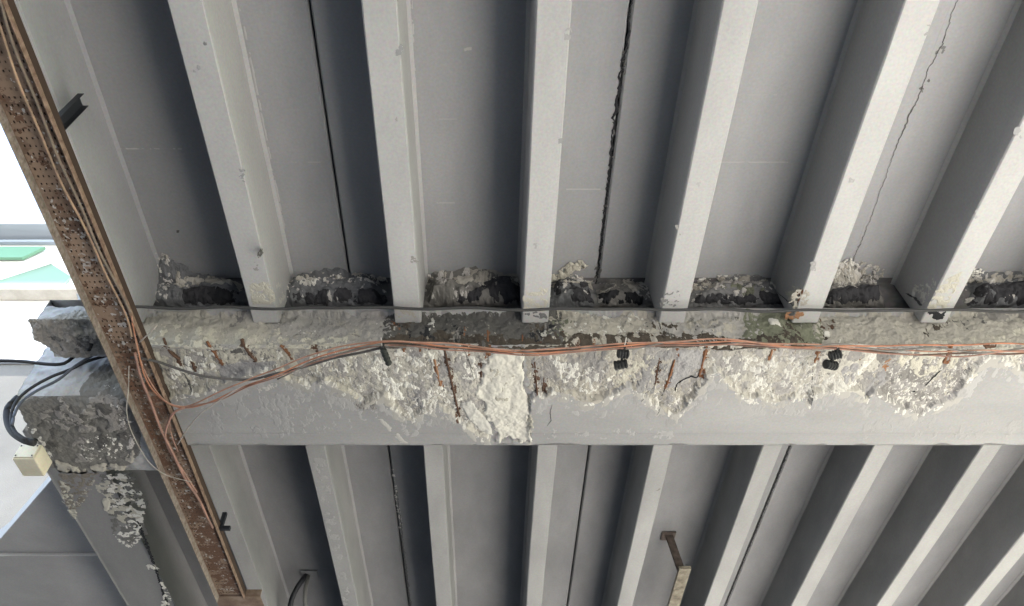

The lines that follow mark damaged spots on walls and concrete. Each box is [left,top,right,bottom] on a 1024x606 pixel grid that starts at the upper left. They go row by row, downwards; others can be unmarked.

crack [595,0,633,284]
crack [853,0,958,261]
spalling [28,310,105,359]
spalling [137,282,506,443]
corrosion [433,356,461,423]
spalling [521,272,1024,418]
peeling [60,472,148,544]